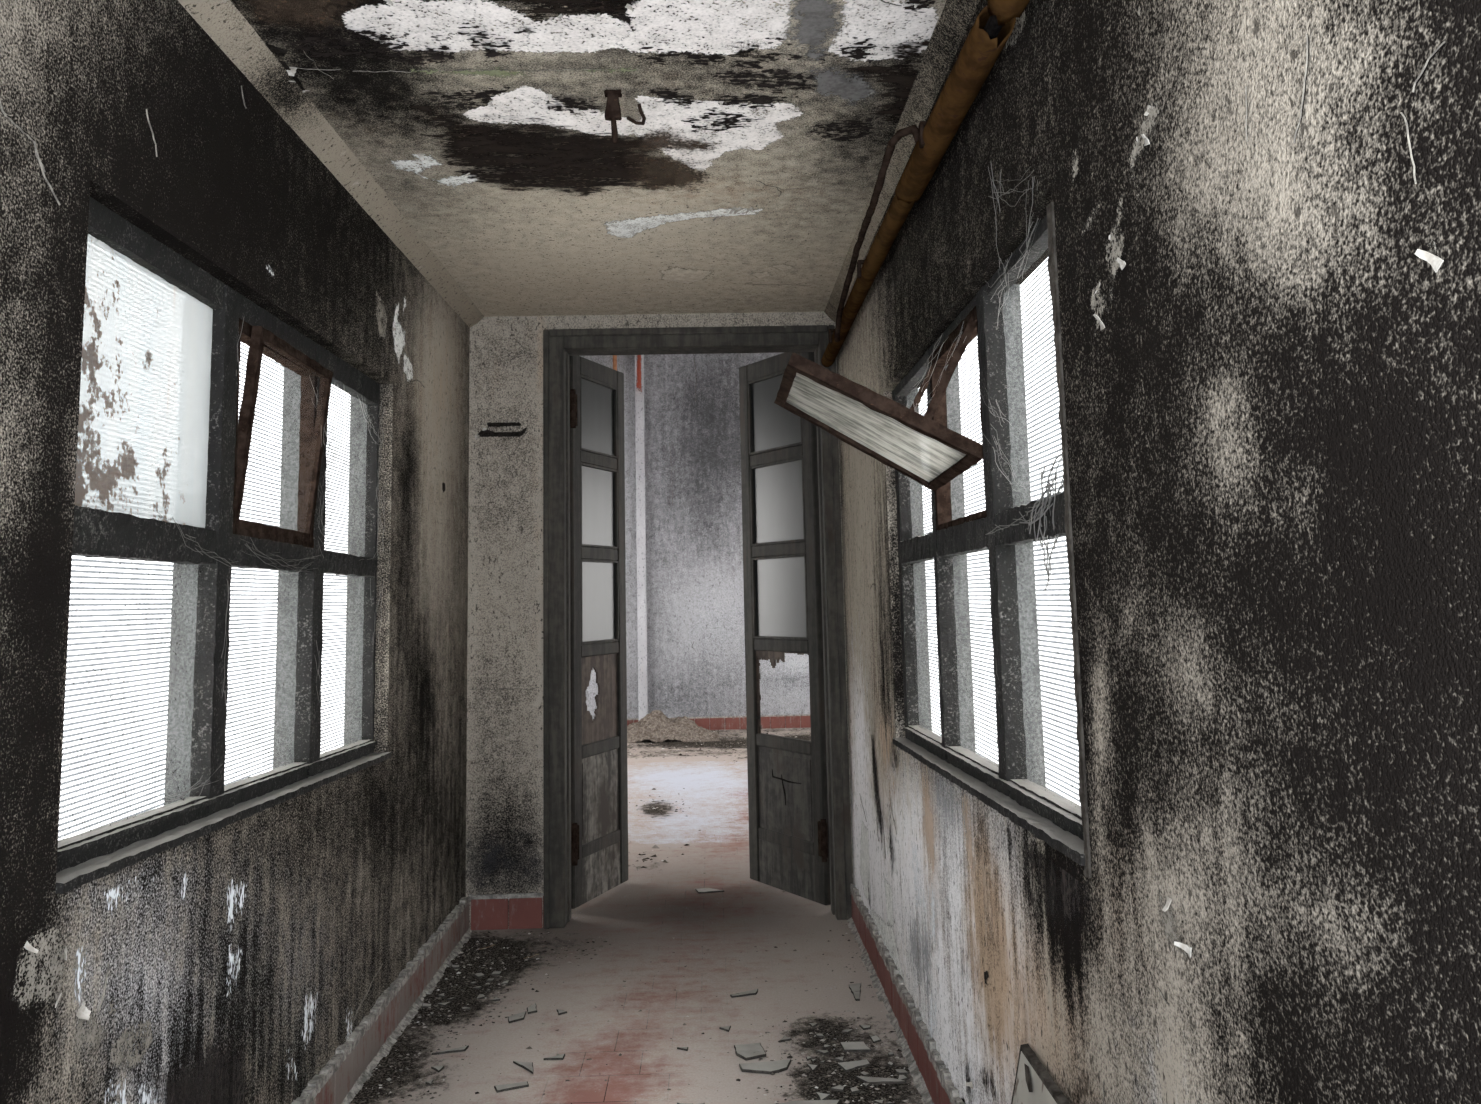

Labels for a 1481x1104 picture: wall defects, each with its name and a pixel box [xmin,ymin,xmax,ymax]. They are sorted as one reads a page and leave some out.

damp [241,0,638,65]
flaking render [342,0,795,56]
flaking render [828,0,939,62]
damp [903,0,935,13]
flaking render [463,86,803,173]
damp [406,0,930,196]
flaking render [605,207,763,238]
flaking render [375,291,413,381]
damp [871,735,899,883]
damp [226,879,247,996]
flaking render [13,925,154,1072]
damp [288,994,316,1079]